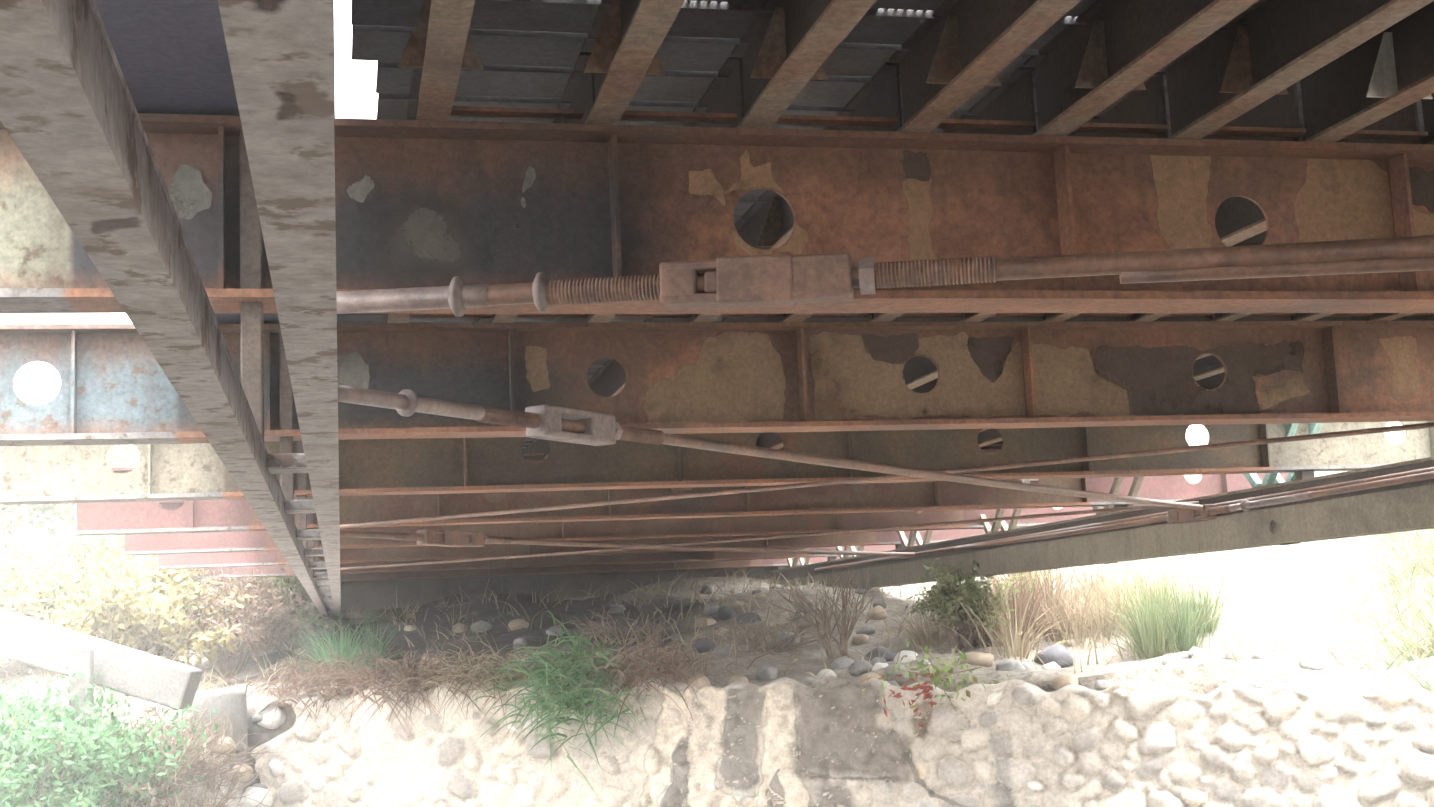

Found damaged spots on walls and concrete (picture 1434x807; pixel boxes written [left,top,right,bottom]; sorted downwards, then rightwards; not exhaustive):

peeling [688,149,785,207]
peeling [732,224,809,256]
corrosion [903,150,931,181]
peeling [902,178,936,262]
peeling [1149,155,1213,250]
corrosion [1409,167,1434,213]
corrosion [862,333,919,364]
peeling [809,331,1130,421]
corrosion [967,336,1014,381]
corrosion [1094,340,1304,416]
peeling [1256,375,1310,410]
leakage [640,674,911,807]